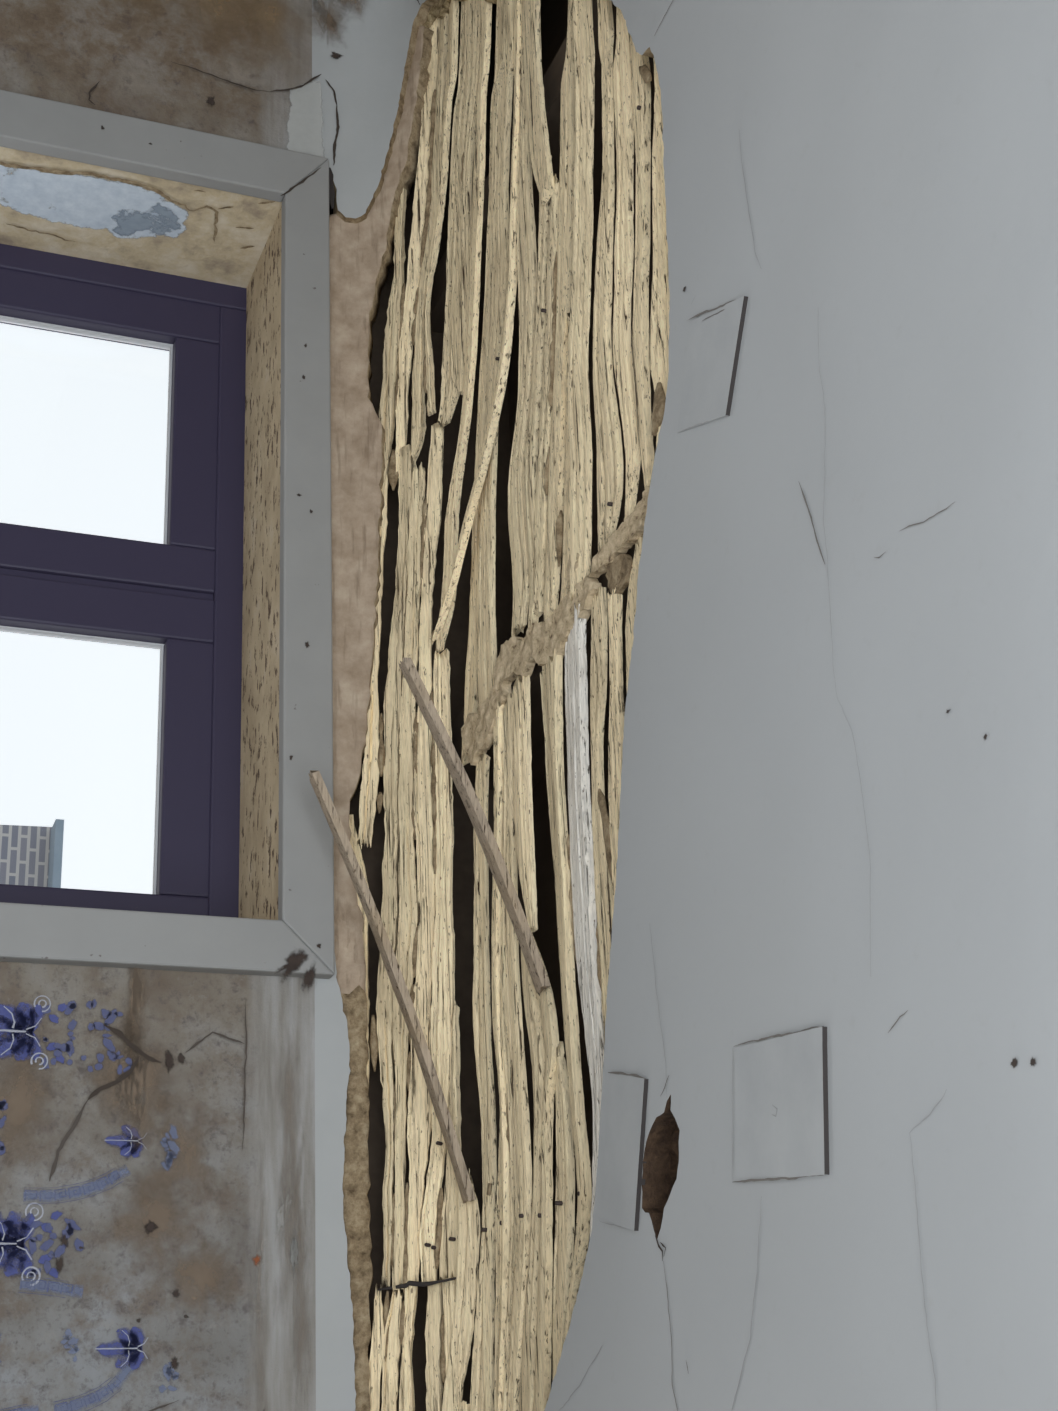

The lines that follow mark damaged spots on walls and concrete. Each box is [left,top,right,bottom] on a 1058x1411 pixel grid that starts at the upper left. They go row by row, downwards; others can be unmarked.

crack [173,62,340,196]
peeling [0,161,218,242]
flaking render [329,0,670,1411]
peeling [278,952,315,988]
crack [49,1003,247,1181]